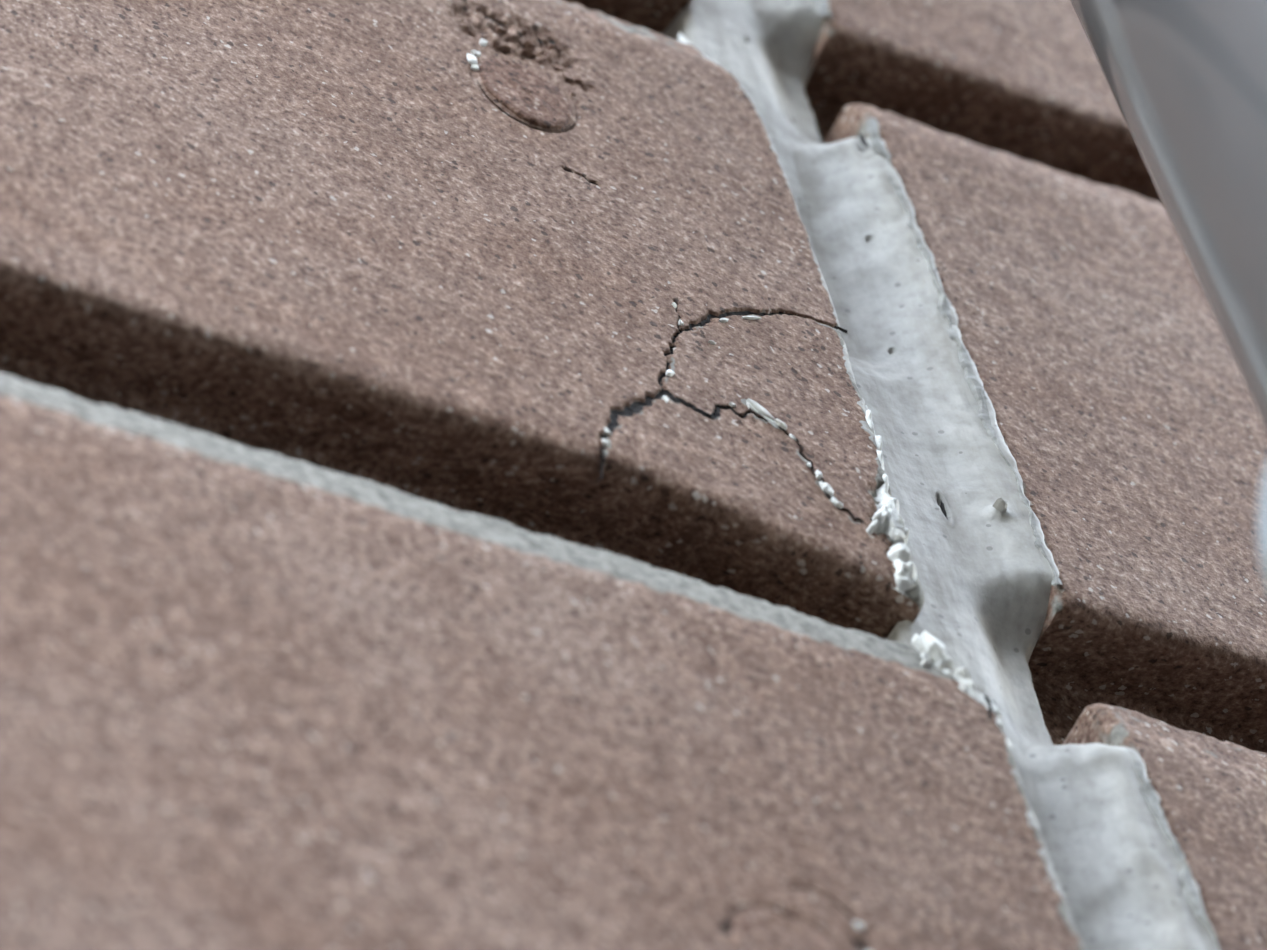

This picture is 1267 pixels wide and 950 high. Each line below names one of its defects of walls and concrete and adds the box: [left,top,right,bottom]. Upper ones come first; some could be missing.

spalling [463,0,583,131]
crack [597,302,863,523]